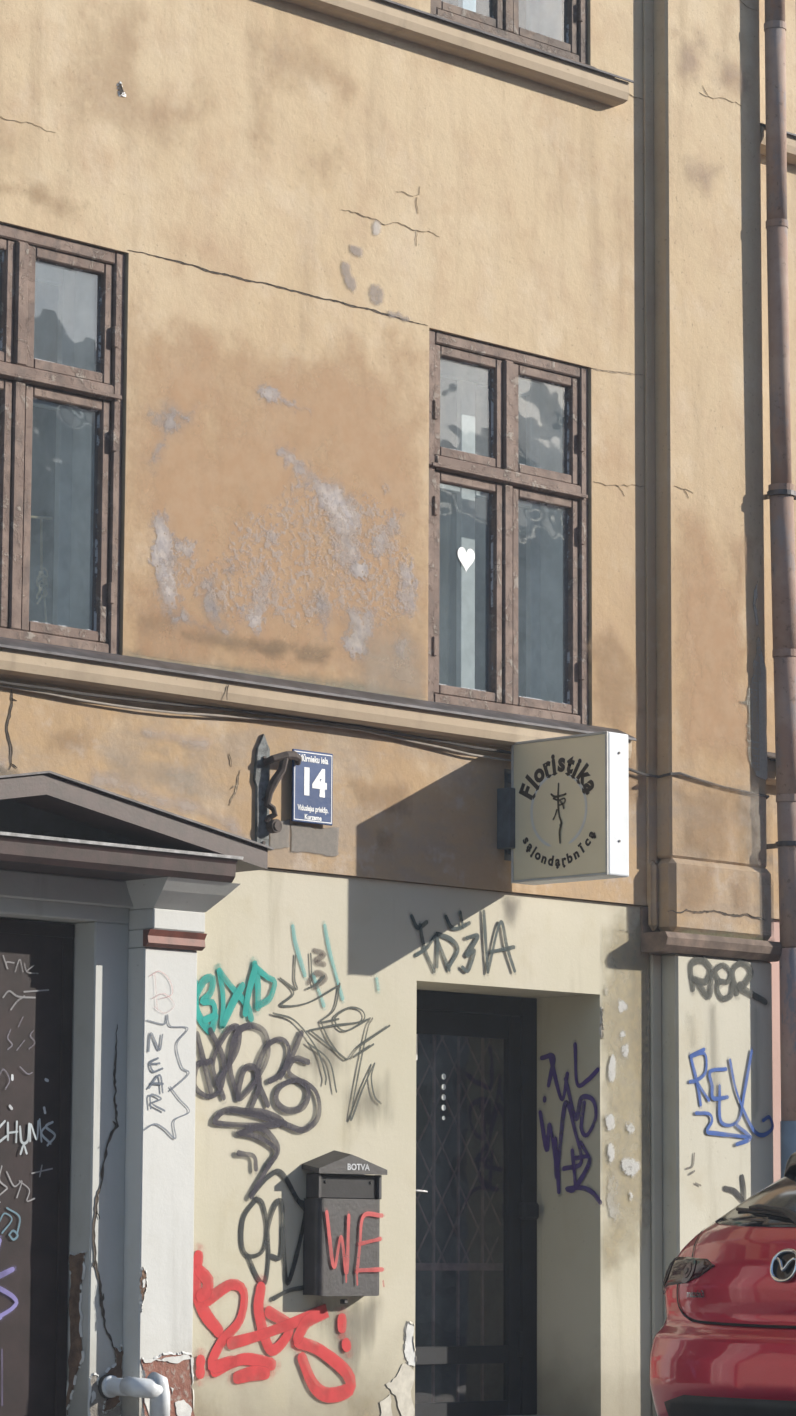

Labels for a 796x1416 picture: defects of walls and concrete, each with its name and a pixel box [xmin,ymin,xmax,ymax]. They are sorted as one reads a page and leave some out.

crack [344,188,440,246]
peeling [342,245,409,320]
crack [6,685,17,770]
peeling [599,989,629,1082]
crack [92,1024,119,1350]
peeling [606,1114,640,1221]
peeling [138,1267,148,1312]
peeling [66,1251,123,1416]
peeling [141,1351,195,1416]